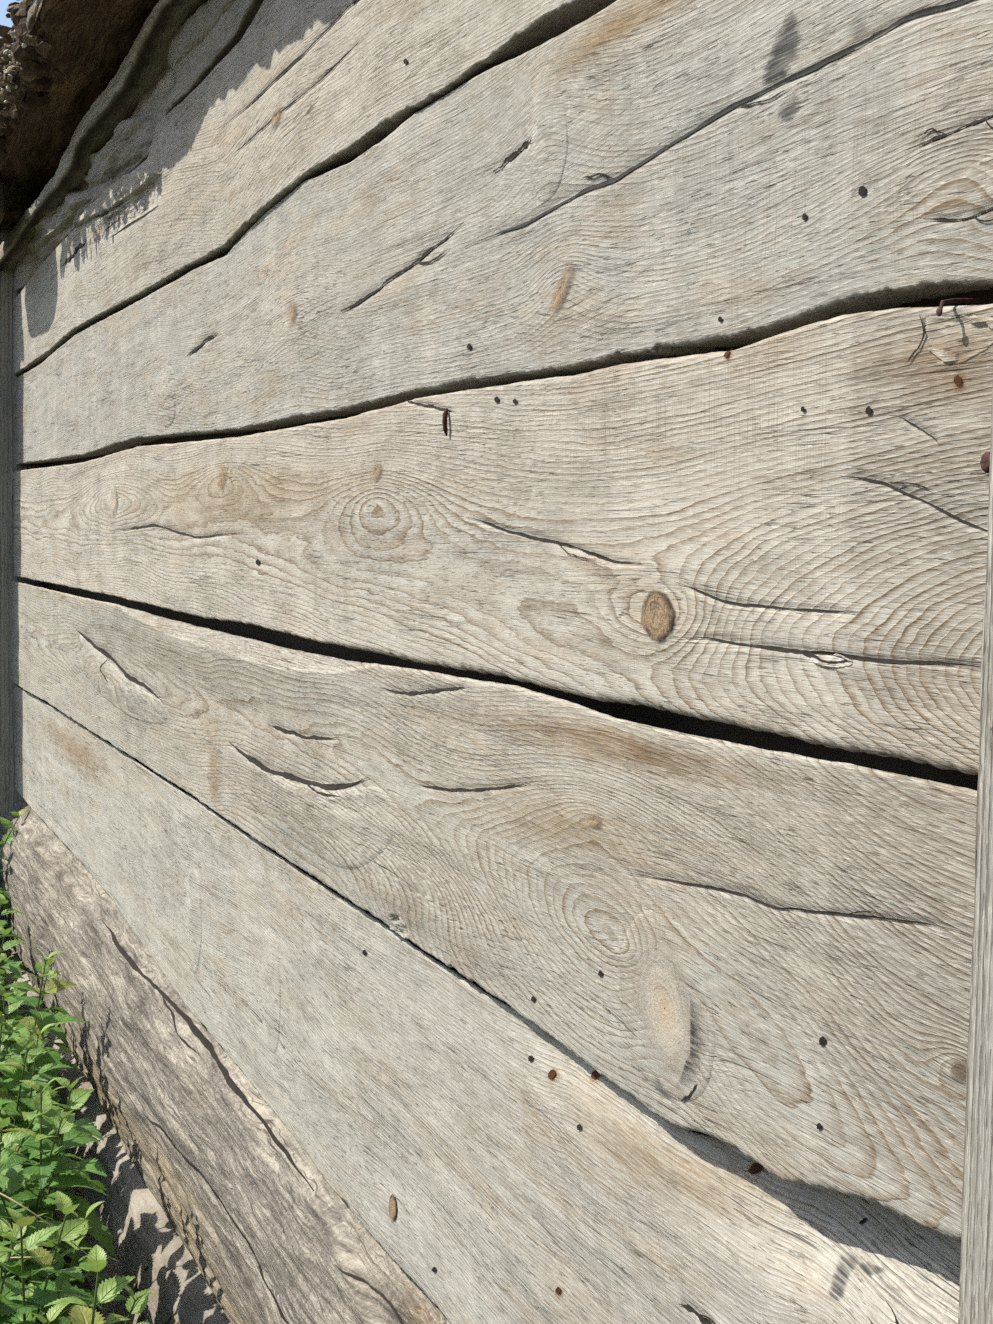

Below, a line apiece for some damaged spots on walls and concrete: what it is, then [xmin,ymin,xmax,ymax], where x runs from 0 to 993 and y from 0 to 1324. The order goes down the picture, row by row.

crack [341,0,970,311]
crack [906,314,925,363]
crack [840,475,988,531]
crack [76,629,163,702]
crack [673,636,980,667]
crack [267,724,337,739]
crack [231,743,369,797]
crack [102,920,314,1191]
crack [336,1266,404,1324]